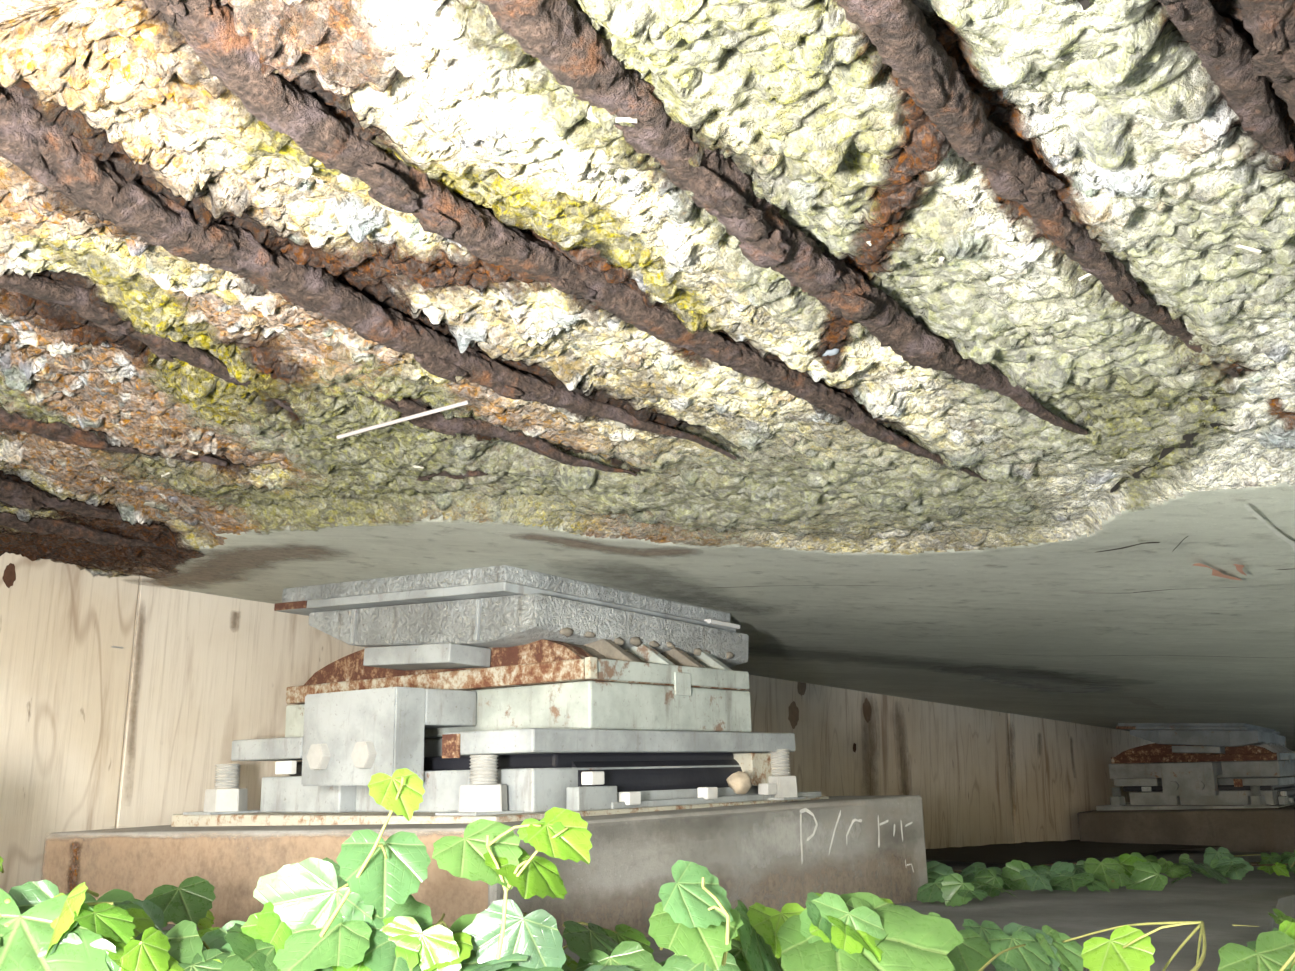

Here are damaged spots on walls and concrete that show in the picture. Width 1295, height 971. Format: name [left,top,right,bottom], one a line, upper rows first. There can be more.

corrosion [1154,0,1295,183]
corrosion [0,0,1253,482]
spalling [0,0,1295,587]
corrosion [0,469,333,587]
corrosion [521,535,695,556]